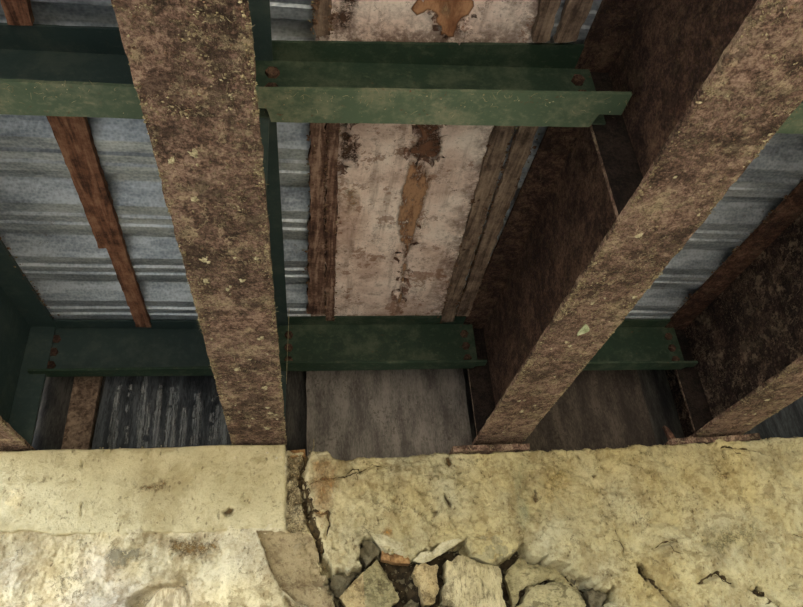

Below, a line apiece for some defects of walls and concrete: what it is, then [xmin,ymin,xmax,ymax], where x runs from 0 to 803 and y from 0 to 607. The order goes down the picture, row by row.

peeling [411,0,477,45]
peeling [391,124,449,313]
peeling [257,455,344,607]
crack [297,456,381,561]
spalling [346,533,549,607]
crack [697,571,731,584]